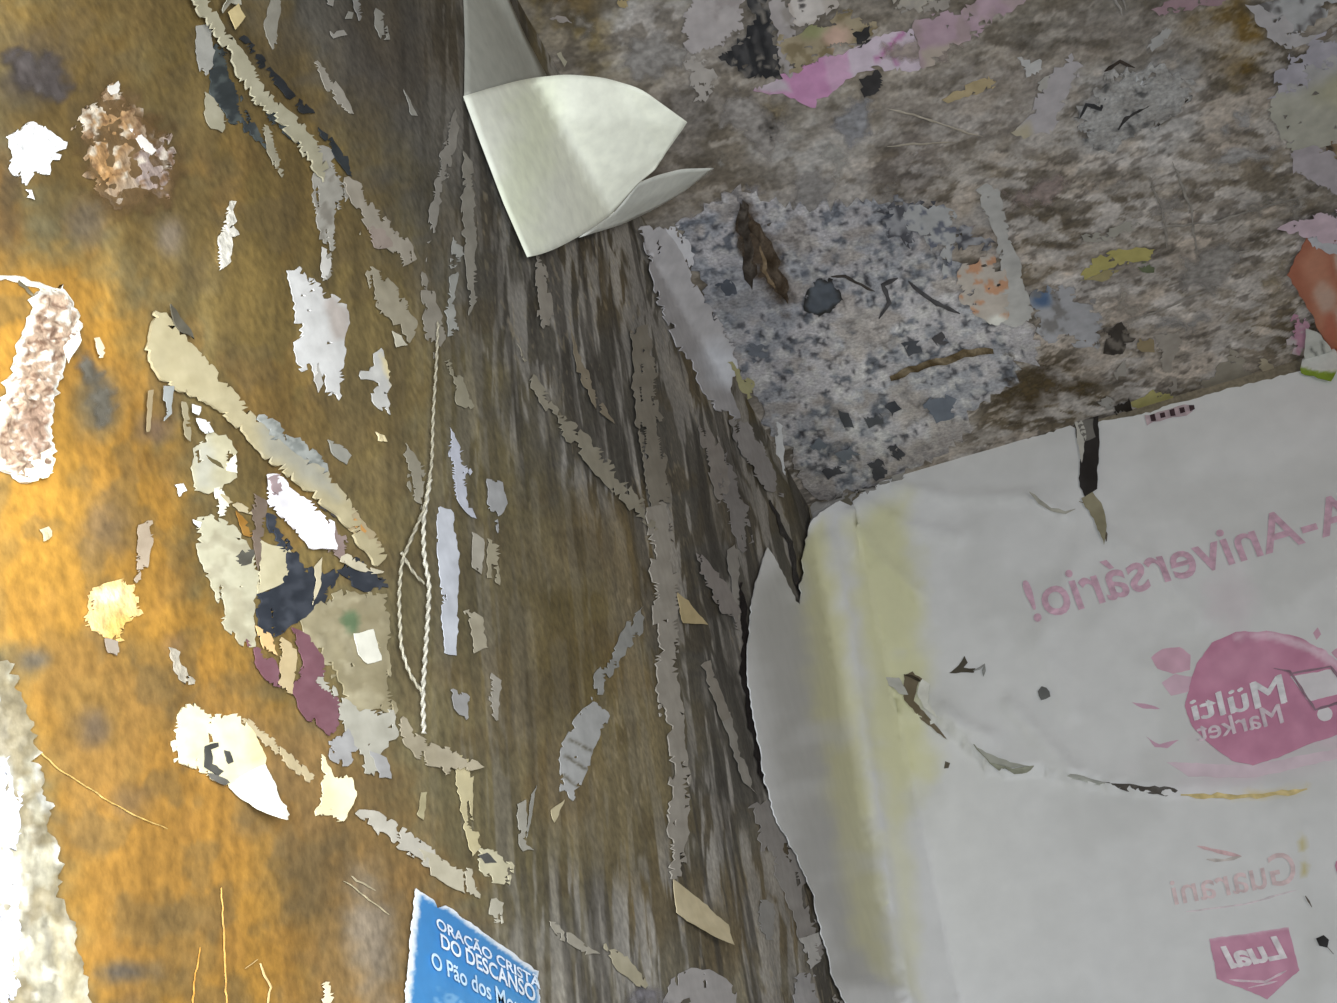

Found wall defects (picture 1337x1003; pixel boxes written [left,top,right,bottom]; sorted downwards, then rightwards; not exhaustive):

rust [84,93,178,214]
flaking render [0,284,105,484]
peeling [192,404,214,434]
peeling [40,527,52,541]
spalling [0,660,92,1003]